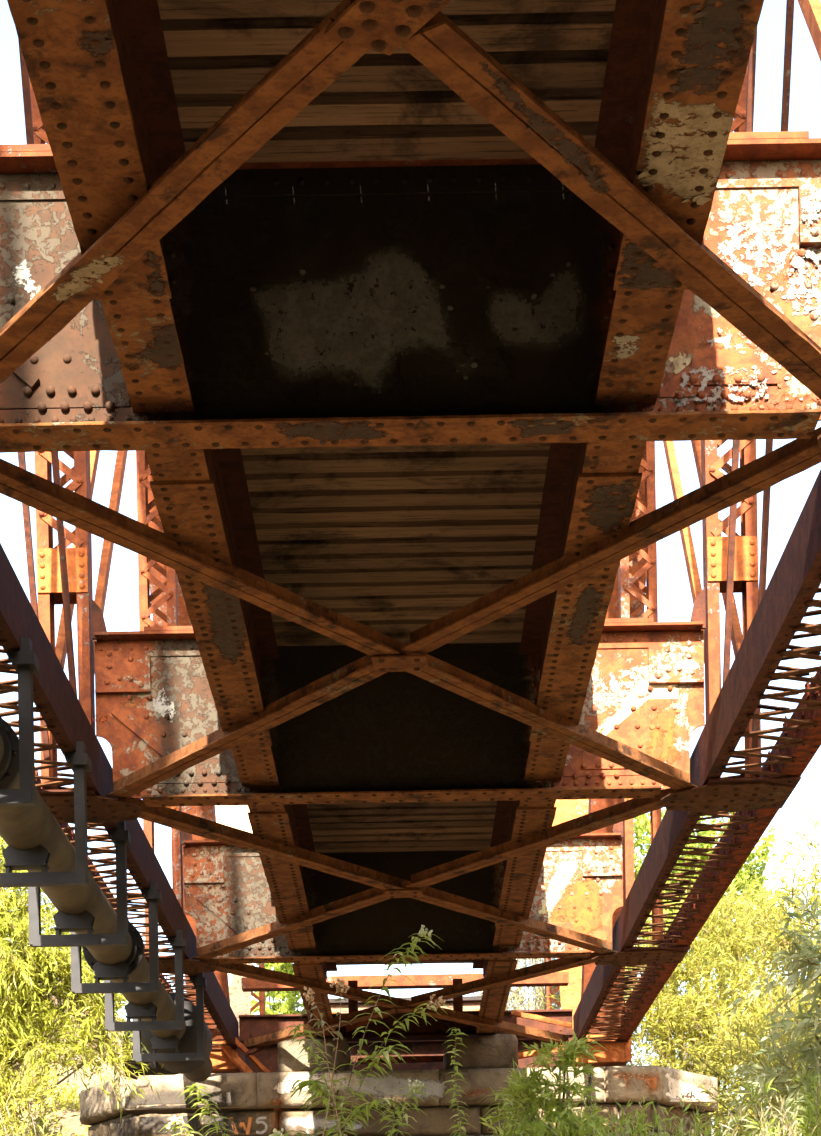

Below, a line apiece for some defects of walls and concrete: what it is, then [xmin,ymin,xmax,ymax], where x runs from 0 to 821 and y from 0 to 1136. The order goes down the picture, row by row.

corrosion [670,0,751,95]
peeling [9,252,125,301]
peeling [717,194,821,315]
peeling [692,295,759,348]
peeling [669,352,814,407]
peeling [152,688,176,723]
peeling [593,666,679,735]
peeling [538,860,578,918]